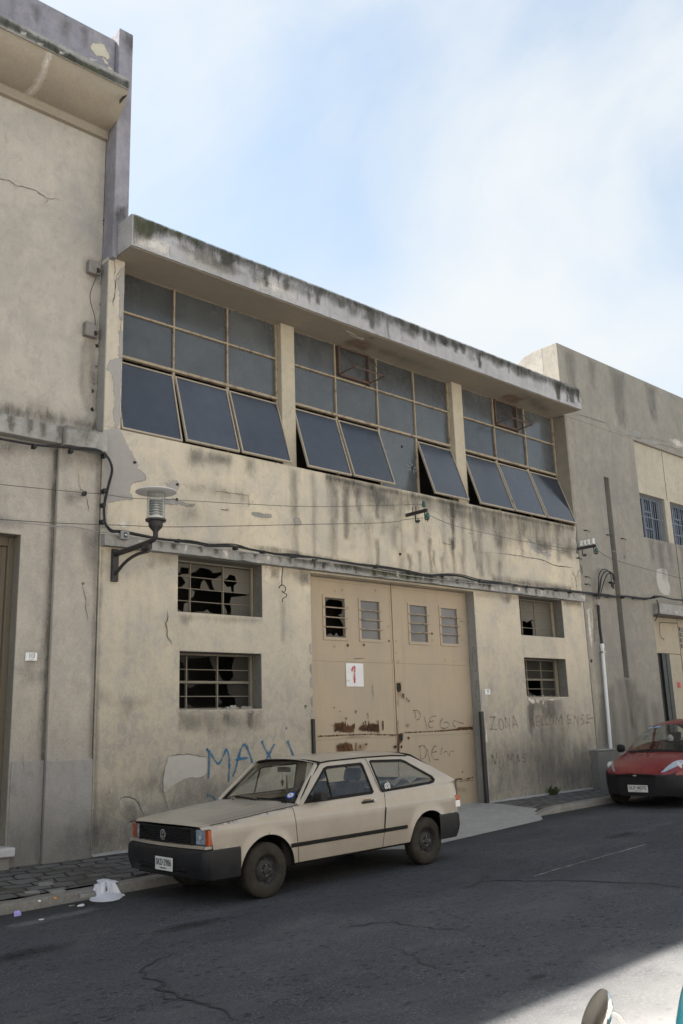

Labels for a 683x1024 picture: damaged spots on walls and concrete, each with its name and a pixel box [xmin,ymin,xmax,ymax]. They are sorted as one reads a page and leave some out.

peeling [90,43,113,71]
crack [0,178,57,203]
damp [135,215,580,402]
peeling [91,266,146,528]
damp [441,501,563,549]
rust [318,707,473,752]
peeling [160,753,207,810]